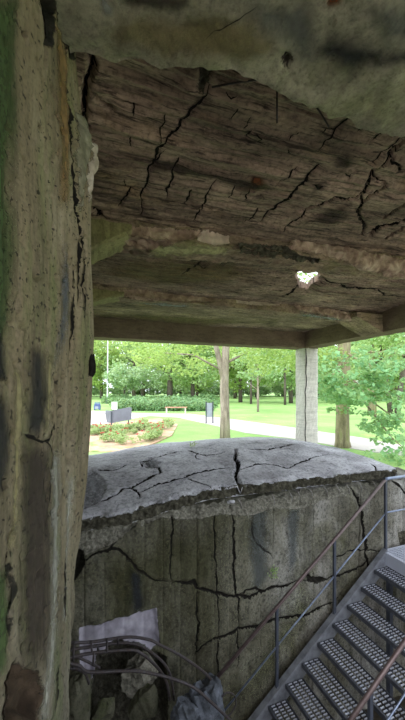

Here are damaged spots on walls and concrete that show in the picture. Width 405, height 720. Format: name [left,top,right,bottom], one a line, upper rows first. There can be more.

crack [67,54,102,345]
crack [118,84,210,214]
crack [184,179,217,221]
crack [226,92,264,143]
crack [228,118,405,232]
crack [323,277,398,297]
crack [64,348,380,673]